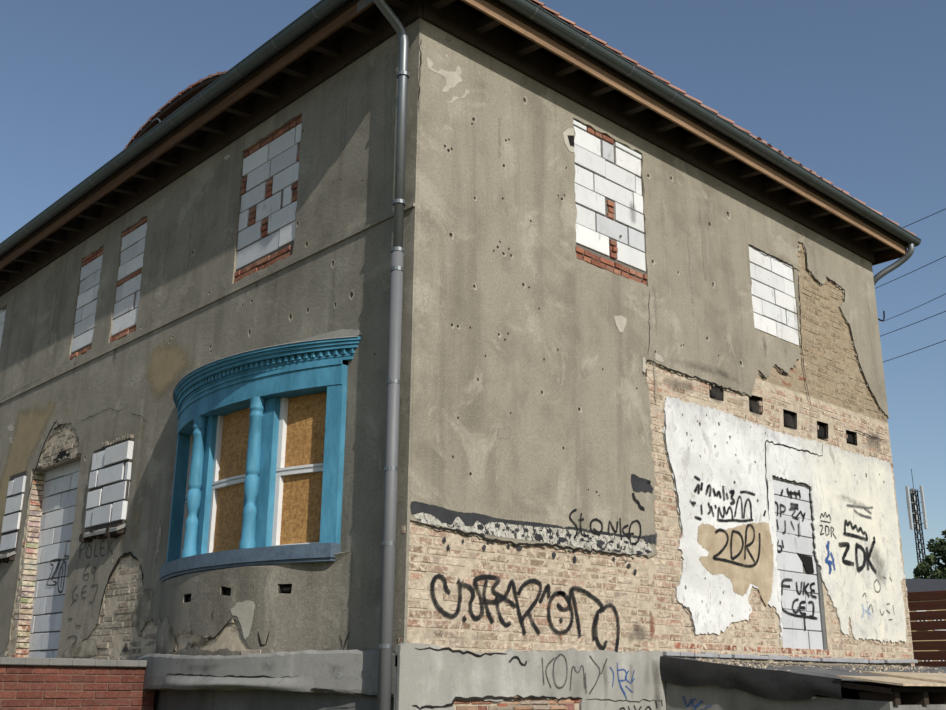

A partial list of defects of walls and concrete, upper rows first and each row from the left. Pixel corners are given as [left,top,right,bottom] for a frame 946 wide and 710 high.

peeling [0,403,87,544]
peeling [398,243,915,667]
flaking render [62,555,261,660]